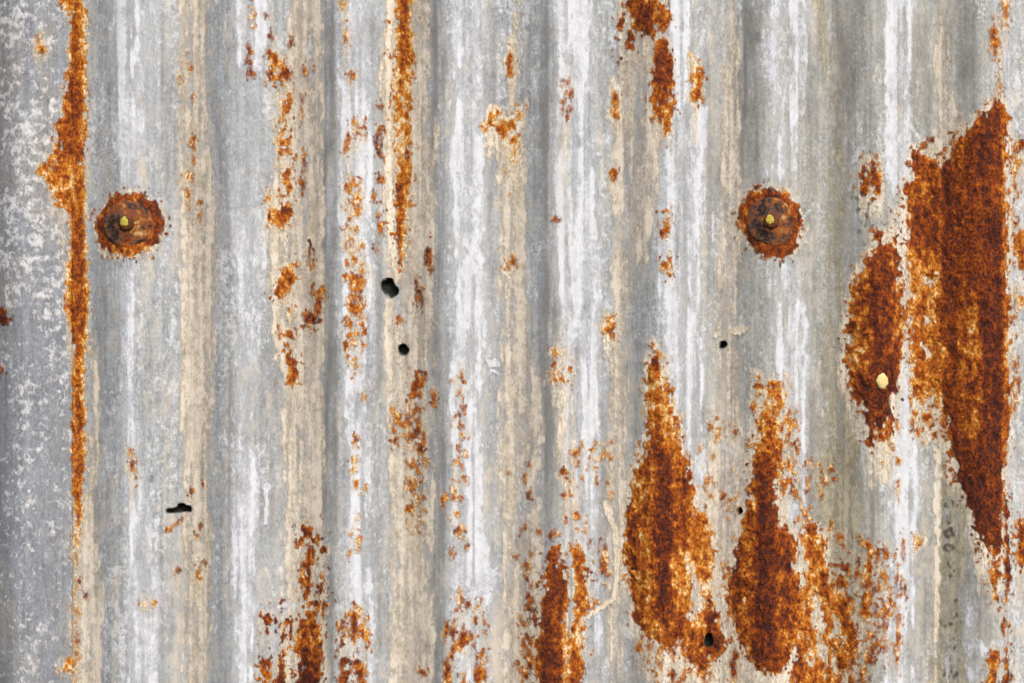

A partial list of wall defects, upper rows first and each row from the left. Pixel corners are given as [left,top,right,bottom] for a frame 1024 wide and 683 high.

rust [244,0,316,401]
rust [338,0,437,401]
rust [478,35,529,201]
rust [606,0,709,154]
rust [726,179,809,267]
rust [35,0,174,683]
rust [254,513,373,683]
rust [386,315,440,539]
rust [440,366,470,561]
rust [442,587,490,683]
rust [512,338,928,683]
rust [838,0,1024,683]